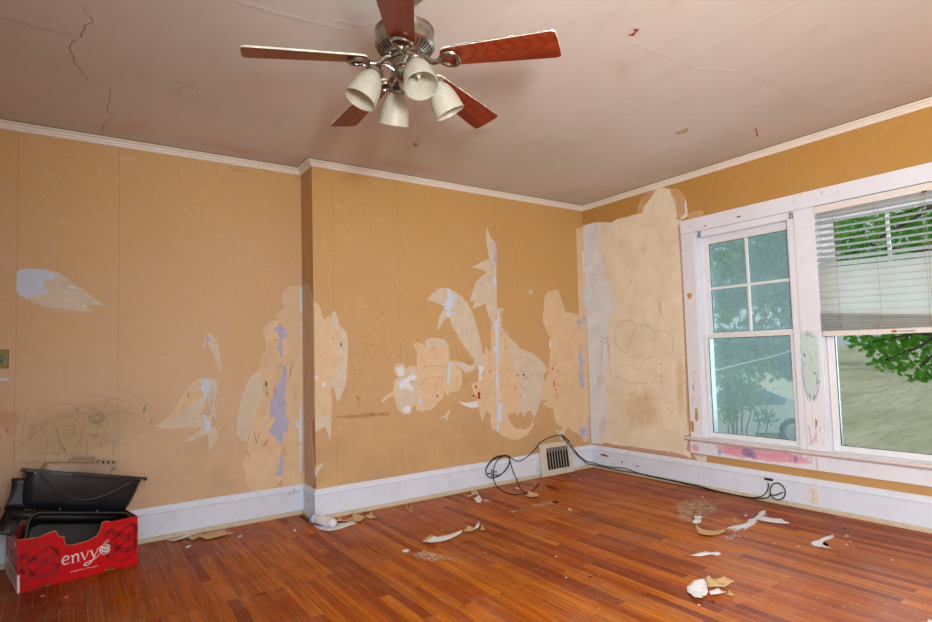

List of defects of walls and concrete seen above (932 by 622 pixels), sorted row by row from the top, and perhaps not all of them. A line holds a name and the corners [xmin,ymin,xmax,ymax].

crack [1,6,113,134]
peeling [16,269,56,298]
peeling [443,289,457,317]
peeling [197,378,210,399]
peeling [269,287,303,471]
peeling [478,310,503,431]